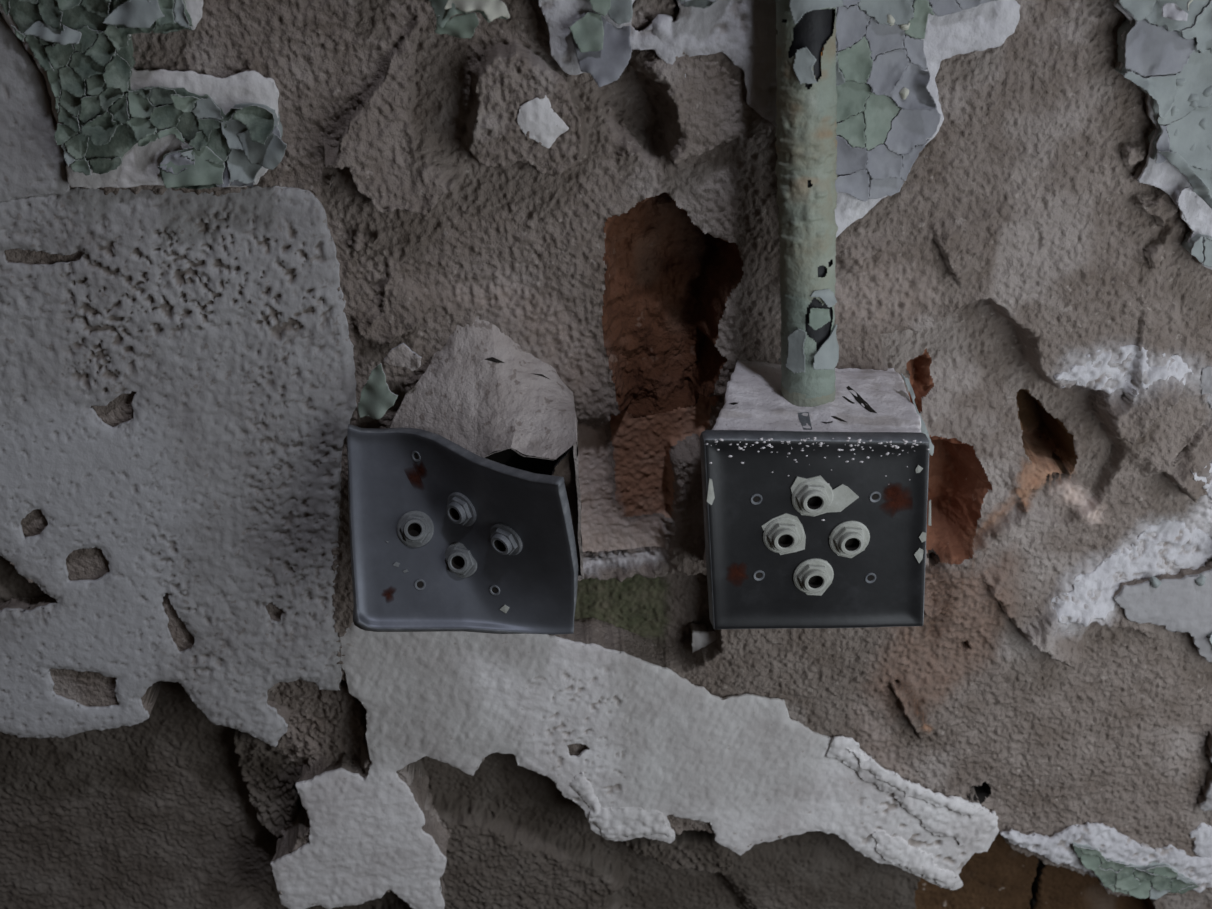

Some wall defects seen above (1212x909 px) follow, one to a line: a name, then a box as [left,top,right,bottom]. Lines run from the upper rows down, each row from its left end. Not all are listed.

peeling [0,0,287,189]
peeling [429,0,510,39]
peeling [568,0,717,88]
peeling [789,0,998,202]
peeling [1110,0,1212,267]
spalling [602,192,744,518]
spalling [879,299,1122,565]
spalling [0,556,48,606]
spalling [0,679,367,909]
spalling [307,890,412,909]
spalling [400,752,1199,909]
crack [1029,859,1046,909]